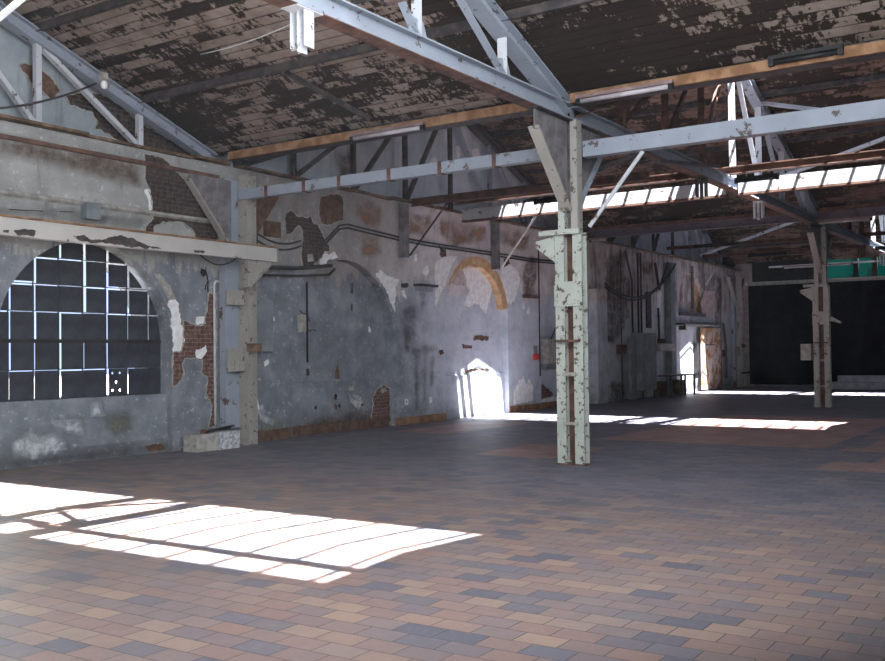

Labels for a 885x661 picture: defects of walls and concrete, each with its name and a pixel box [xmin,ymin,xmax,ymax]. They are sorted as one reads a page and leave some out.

spalling [18,62,219,240]
peeling [74,235,161,249]
spalling [284,193,344,271]
peeling [376,270,407,311]
peeling [414,246,492,314]
peeling [501,258,530,315]
spalling [154,273,218,428]
spalling [361,384,391,423]
peeling [513,377,557,405]